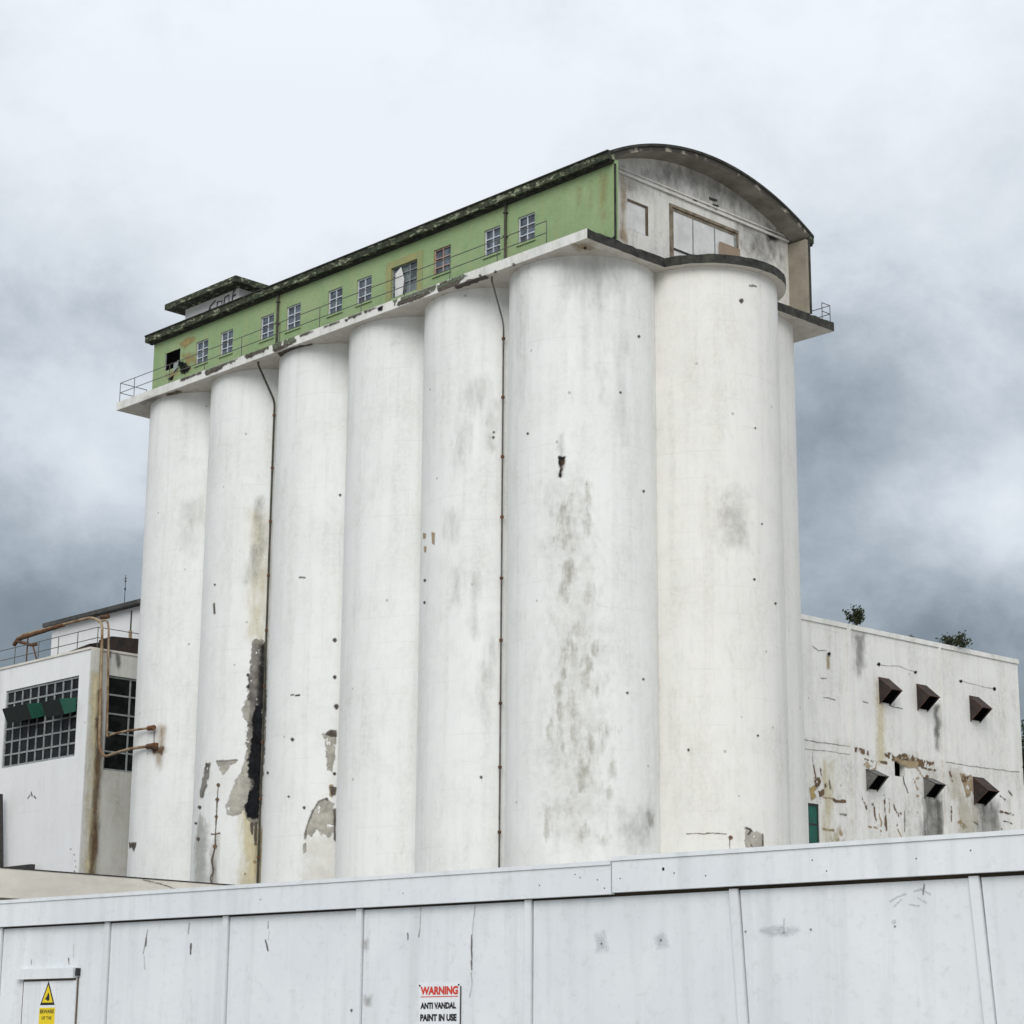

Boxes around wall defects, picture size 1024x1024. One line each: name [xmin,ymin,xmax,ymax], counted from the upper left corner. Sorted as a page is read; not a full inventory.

spalling [198,639,269,845]
rust [85,674,102,874]
leakage [241,811,261,884]
peeling [303,730,337,853]
spalling [729,827,764,848]
peeling [810,765,831,800]
peeling [862,797,905,837]
spalling [854,747,936,797]
leakage [924,800,942,836]
peeling [949,771,978,828]